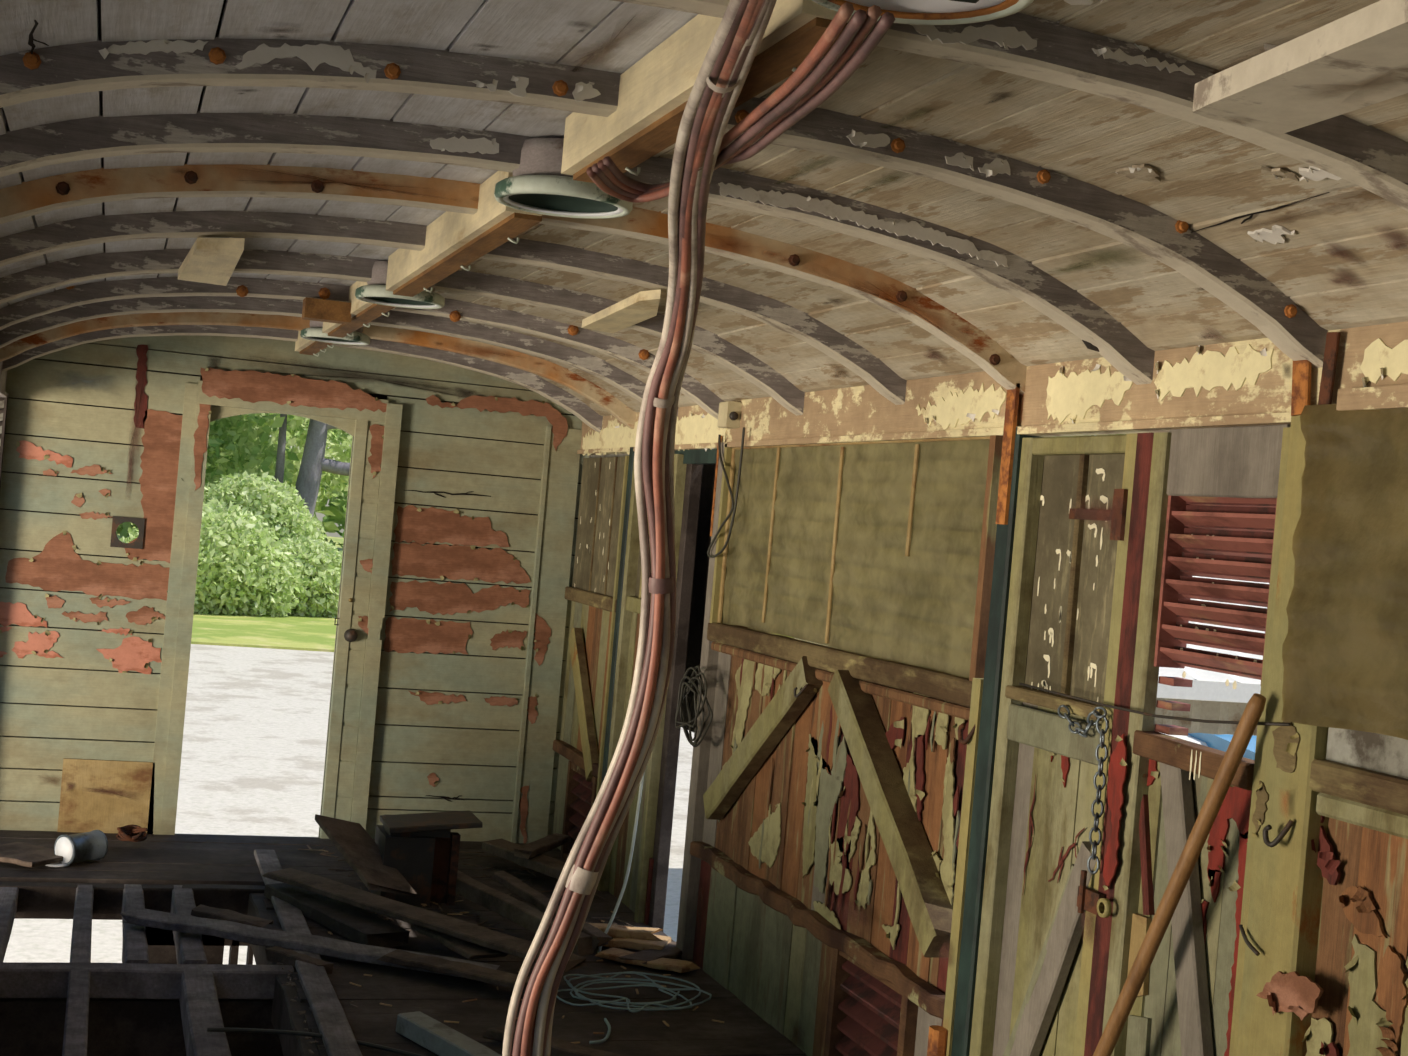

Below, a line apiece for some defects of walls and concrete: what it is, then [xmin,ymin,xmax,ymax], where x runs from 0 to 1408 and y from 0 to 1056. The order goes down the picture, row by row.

peeling [234,43,377,83]
crack [1190,192,1330,233]
rust [877,293,942,327]
peeling [1046,364,1133,424]
peeling [1154,344,1274,401]
peeling [1360,338,1408,388]
peeling [0,344,387,674]
peeling [357,505,551,666]
peeling [722,658,796,768]
peeling [748,758,781,869]
peeling [802,705,876,930]
peeling [1267,934,1408,1056]